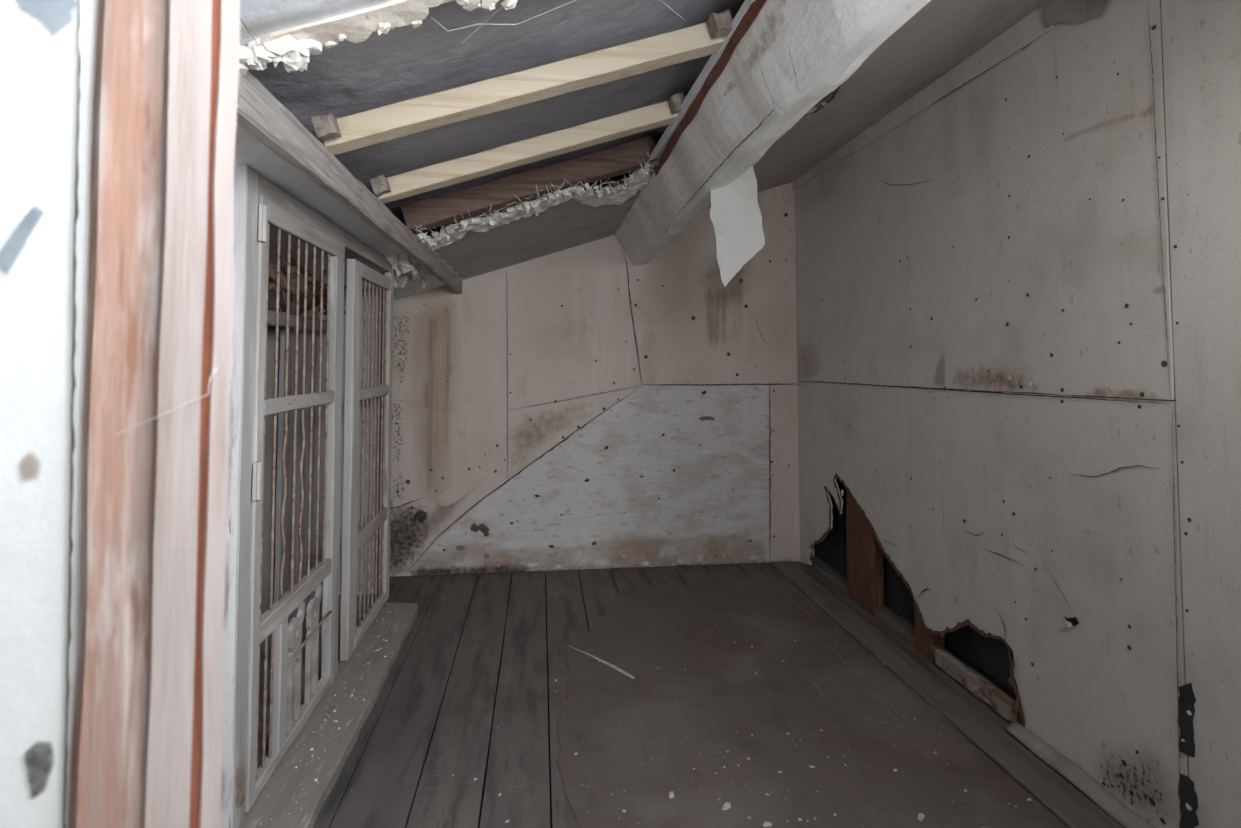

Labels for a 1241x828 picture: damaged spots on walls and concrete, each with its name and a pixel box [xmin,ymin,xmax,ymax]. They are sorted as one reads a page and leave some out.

flaking render [239,0,517,77]
spalling [803,83,843,118]
flaking render [415,154,653,251]
flaking render [381,254,431,288]
crack [809,5,1181,801]
water stain [390,510,427,569]
water stain [1100,750,1166,825]